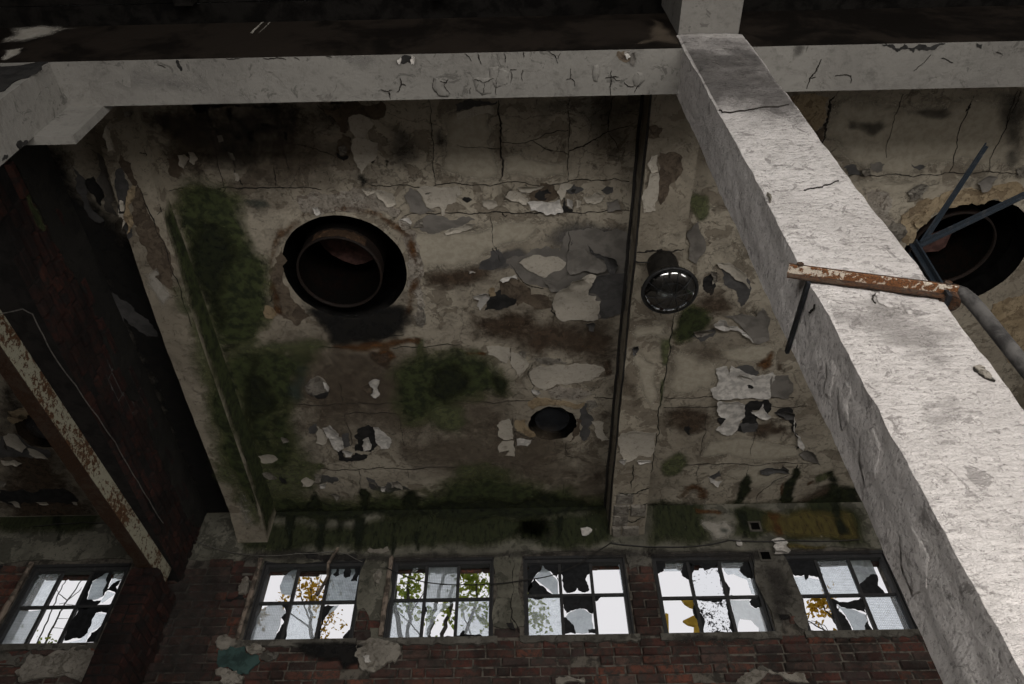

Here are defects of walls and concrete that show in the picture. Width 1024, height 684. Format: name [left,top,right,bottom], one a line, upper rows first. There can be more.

crack [371,51,640,260]
peeling [404,183,621,235]
peeling [642,152,683,213]
crack [803,91,1021,191]
leakage [188,221,238,326]
leakage [241,175,526,469]
peeling [469,228,631,332]
leakage [207,370,256,503]
peeling [308,424,392,462]
leakage [272,364,607,552]
peeling [710,365,820,465]
peeling [355,638,402,673]